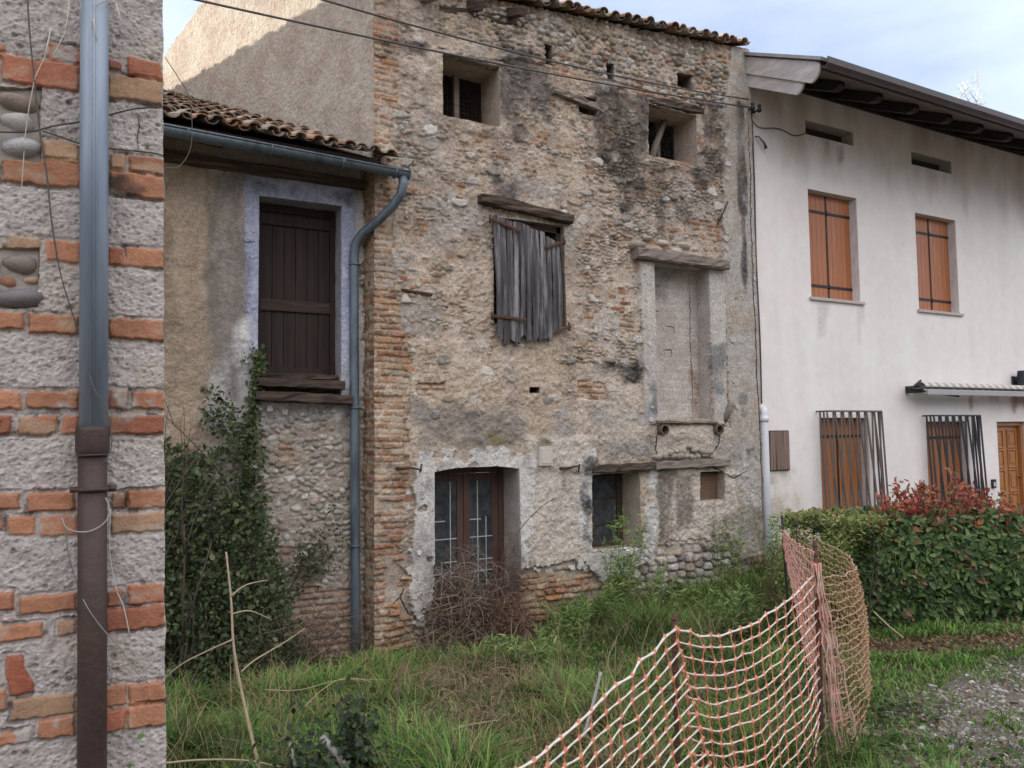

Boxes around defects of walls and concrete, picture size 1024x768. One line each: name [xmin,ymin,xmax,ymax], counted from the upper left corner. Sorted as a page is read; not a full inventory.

leakage [592,83,649,213]
leakage [738,155,747,221]
leakage [606,362,642,382]
spalling [519,533,731,633]